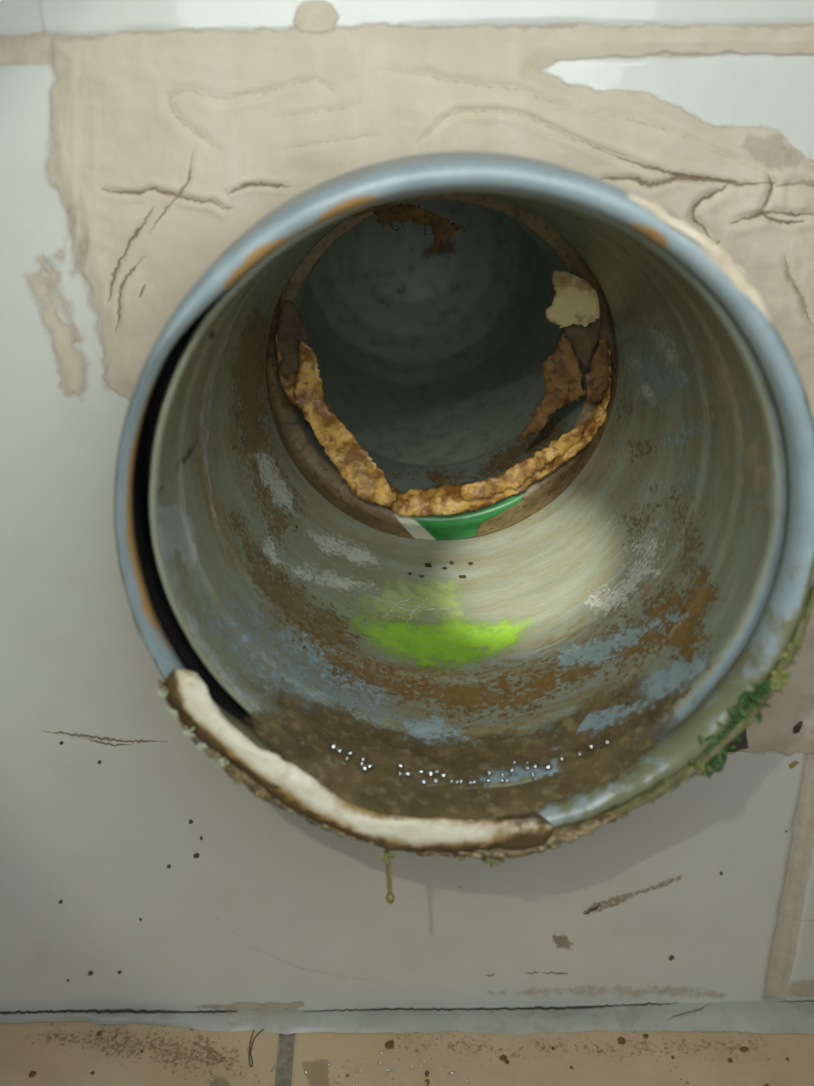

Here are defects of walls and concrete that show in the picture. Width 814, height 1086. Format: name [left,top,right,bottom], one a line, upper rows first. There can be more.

crack [101,151,291,328]
crack [532,118,814,244]
crack [784,256,811,323]
corrosion [386,414,571,488]
corrosion [287,564,726,730]
crack [41,730,167,746]